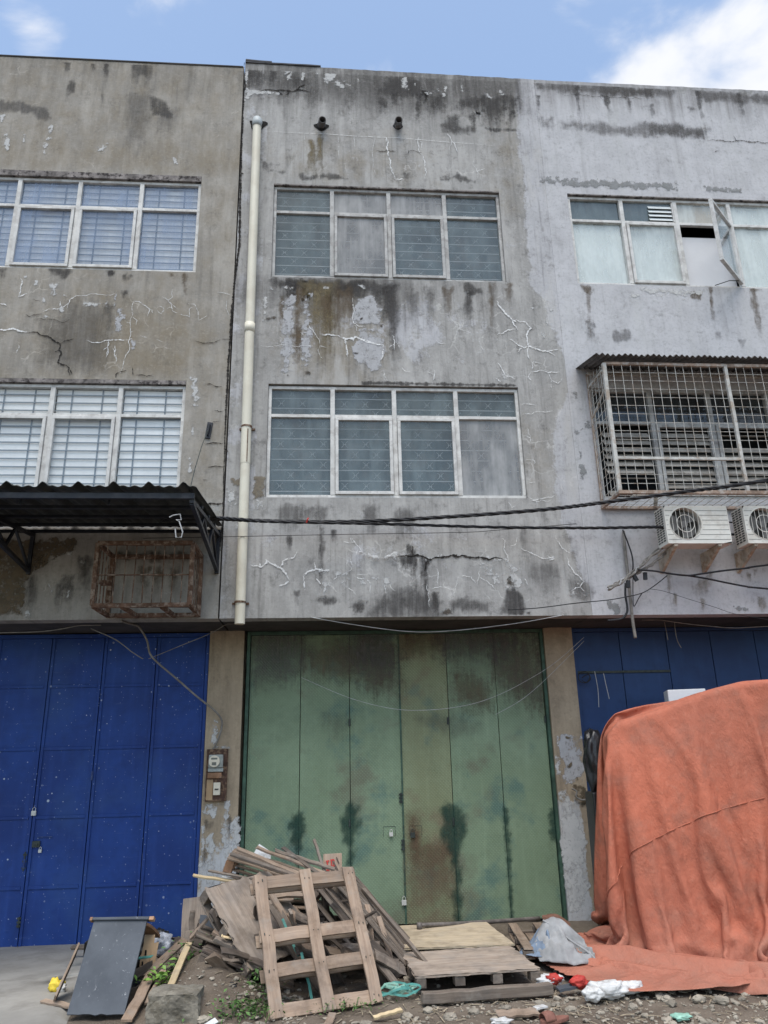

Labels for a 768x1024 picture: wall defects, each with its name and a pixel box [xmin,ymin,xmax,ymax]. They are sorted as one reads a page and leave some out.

damp [152,98,170,117]
crack [0,62,310,551]
damp [274,279,398,349]
crack [269,298,435,380]
peeling [351,285,385,371]
damp [353,545,439,617]
crack [402,536,584,602]
damp [505,588,530,615]
peeling [199,800,241,886]
peeling [555,734,591,912]